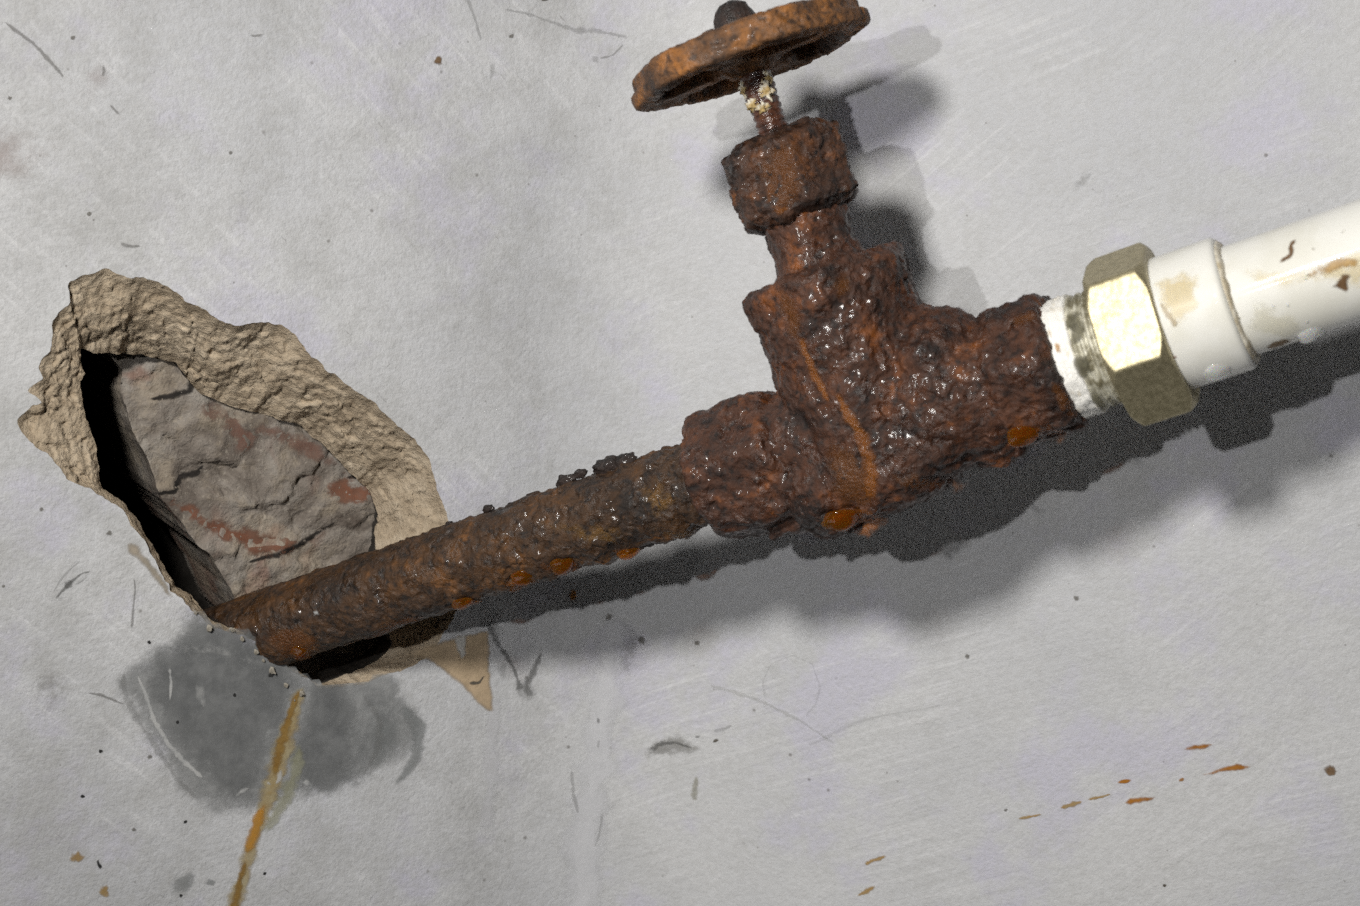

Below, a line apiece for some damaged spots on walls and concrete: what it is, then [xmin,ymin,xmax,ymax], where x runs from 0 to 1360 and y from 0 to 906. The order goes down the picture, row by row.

spalling [17,268,492,710]
water stain [159,631,282,792]
rust [229,692,303,906]
rust [1061,779,1130,809]
rust [1212,764,1246,774]